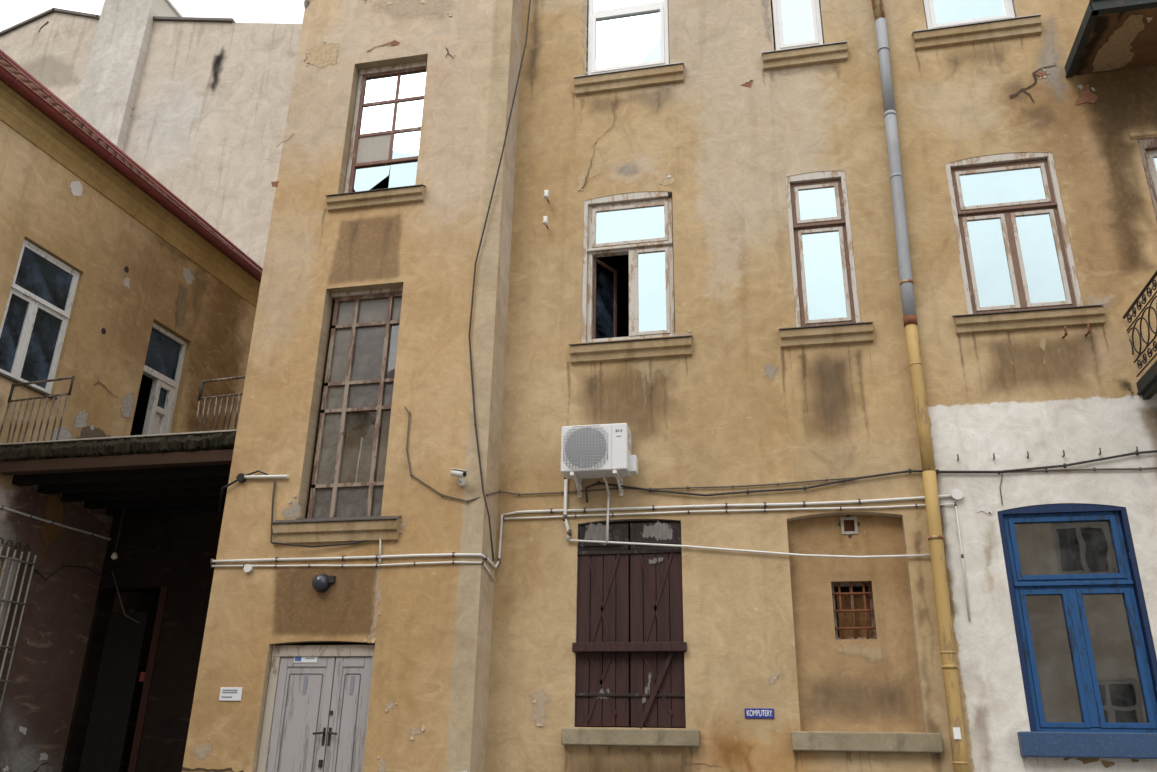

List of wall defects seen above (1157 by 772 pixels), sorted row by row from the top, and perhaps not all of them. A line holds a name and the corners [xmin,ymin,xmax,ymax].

crack [1009,65,1056,103]
spalling [1075,14,1153,105]
crack [581,107,615,189]
damp [1077,12,1157,266]
damp [592,360,676,433]
crack [182,764,243,772]